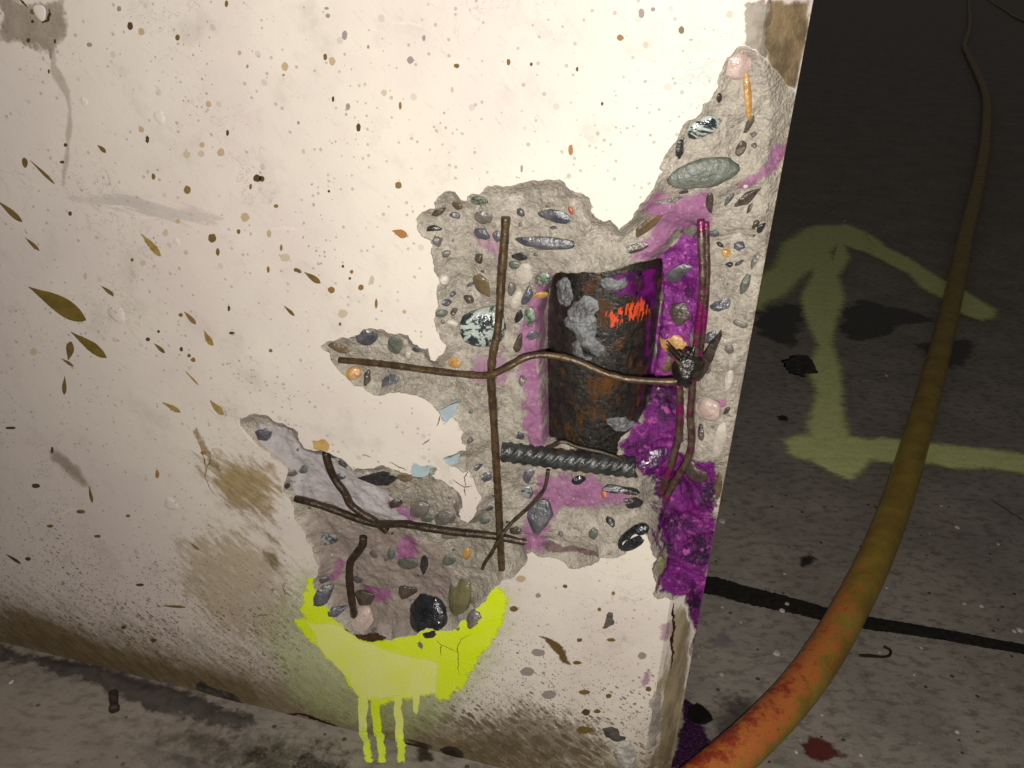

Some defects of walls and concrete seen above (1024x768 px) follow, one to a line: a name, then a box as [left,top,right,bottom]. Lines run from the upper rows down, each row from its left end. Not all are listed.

damp [764,1,808,88]
spalling [241,0,796,656]
corrosion [584,280,610,329]
crack [193,432,213,493]
crack [669,603,677,670]